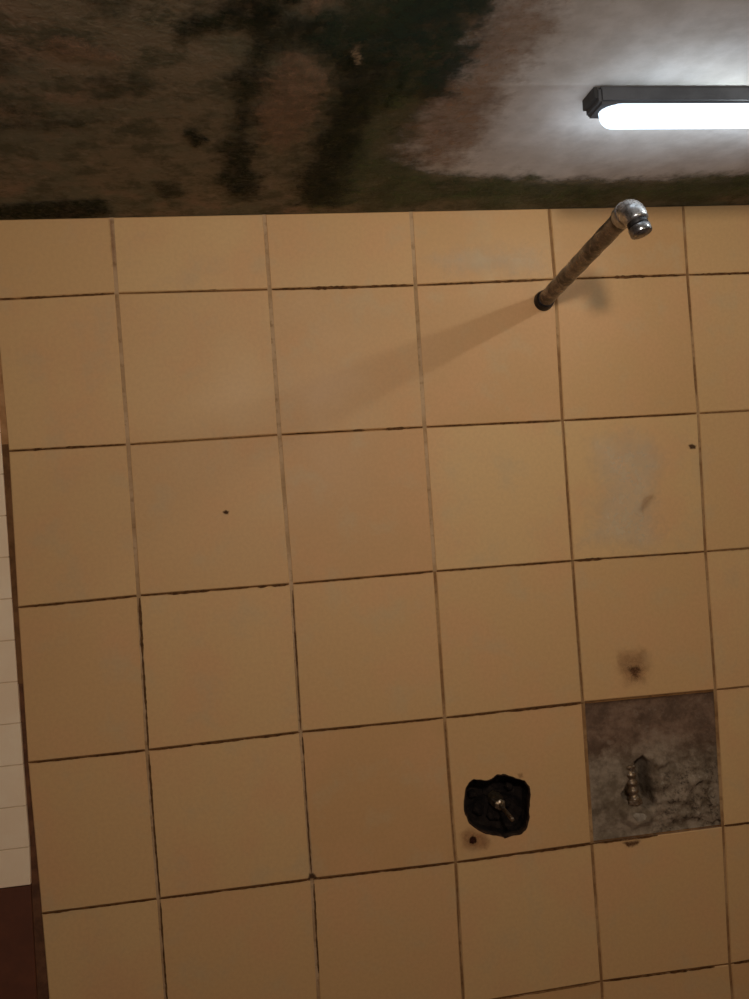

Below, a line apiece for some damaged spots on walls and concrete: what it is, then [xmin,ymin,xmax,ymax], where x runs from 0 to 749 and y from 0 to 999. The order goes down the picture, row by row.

damp [175,0,550,207]
damp [0,200,110,219]
spalling [464,774,531,838]
peeling [585,690,721,843]